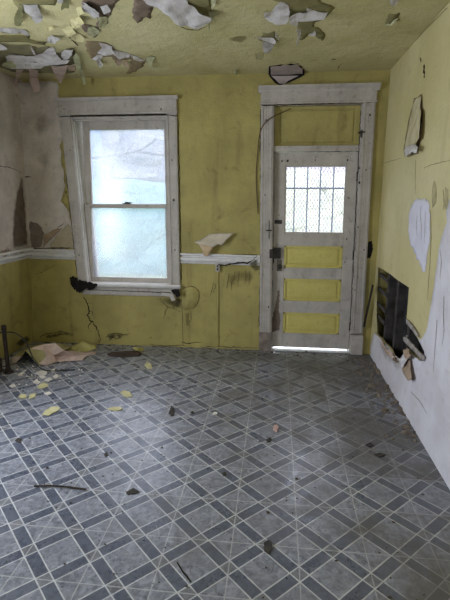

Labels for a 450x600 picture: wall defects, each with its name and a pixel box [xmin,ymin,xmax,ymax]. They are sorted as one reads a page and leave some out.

peeling [132,0,219,31]
peeling [254,0,334,60]
flaking render [268,63,305,85]
flaking render [0,0,158,257]
crack [34,175,77,272]
crack [59,114,182,280]
peeling [195,233,233,257]
crack [83,289,170,343]
flaking render [370,182,450,490]